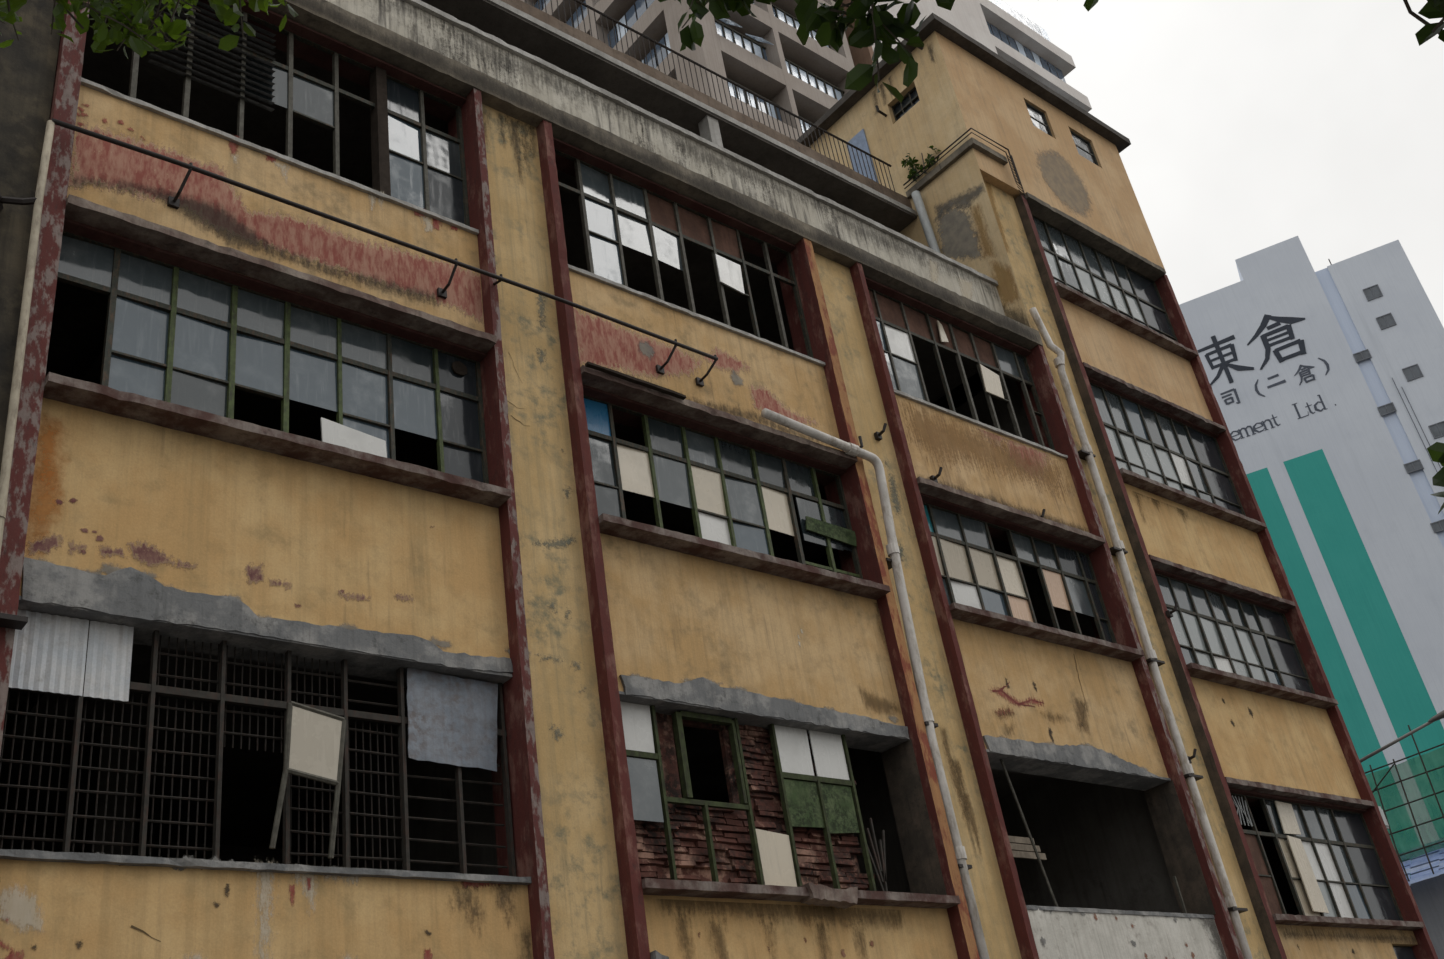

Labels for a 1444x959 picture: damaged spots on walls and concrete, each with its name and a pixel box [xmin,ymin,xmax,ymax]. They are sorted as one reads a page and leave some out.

peeling [28,528,198,569]
peeling [245,563,301,607]